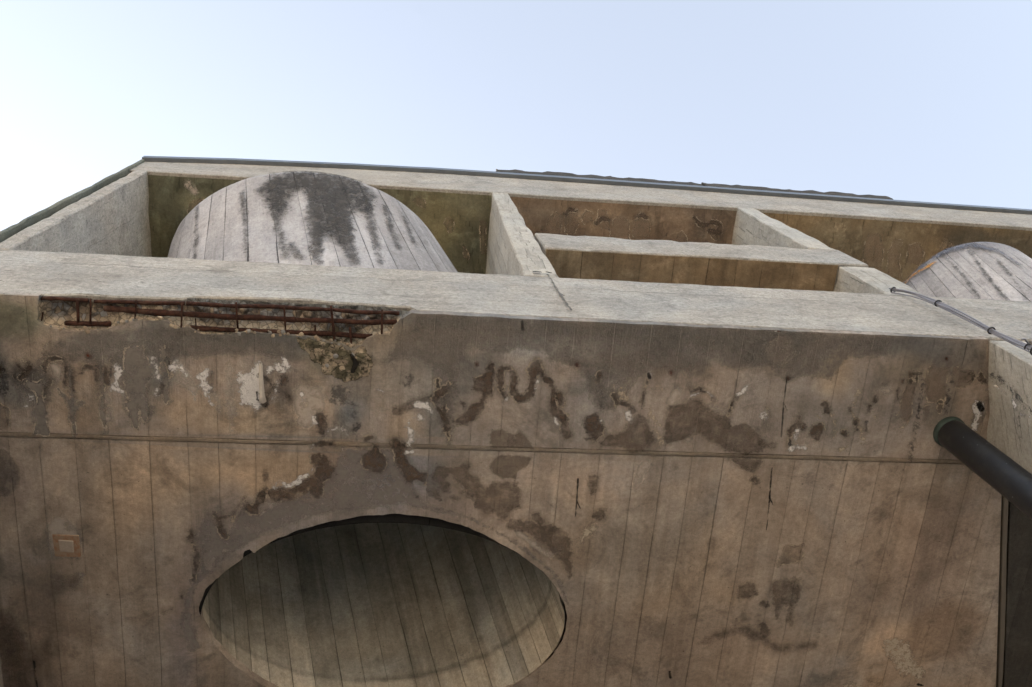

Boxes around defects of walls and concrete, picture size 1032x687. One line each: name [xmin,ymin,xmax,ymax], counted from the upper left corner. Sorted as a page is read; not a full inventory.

leakage [257,171,415,265]
spalling [38,295,410,382]
leakage [0,316,889,650]